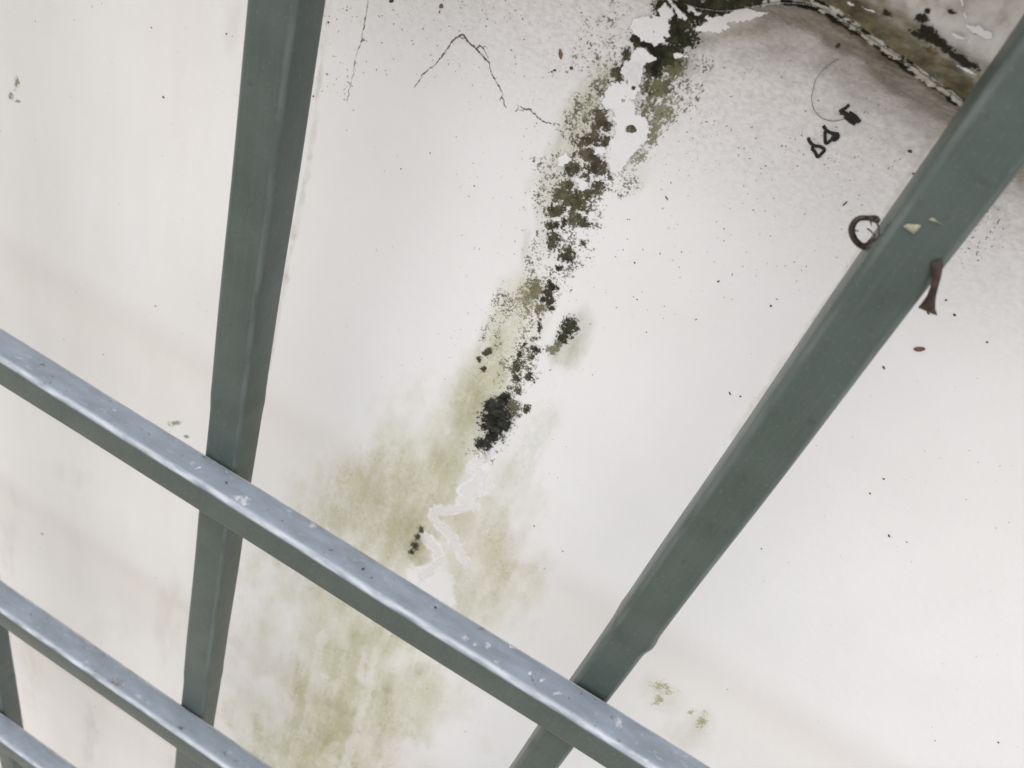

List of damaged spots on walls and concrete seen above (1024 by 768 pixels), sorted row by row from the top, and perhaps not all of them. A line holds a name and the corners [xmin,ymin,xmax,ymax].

crack [415,34,551,124]
peeling [811,0,964,107]
peeling [951,0,993,43]
damp [476,0,981,410]
damp [408,526,424,554]